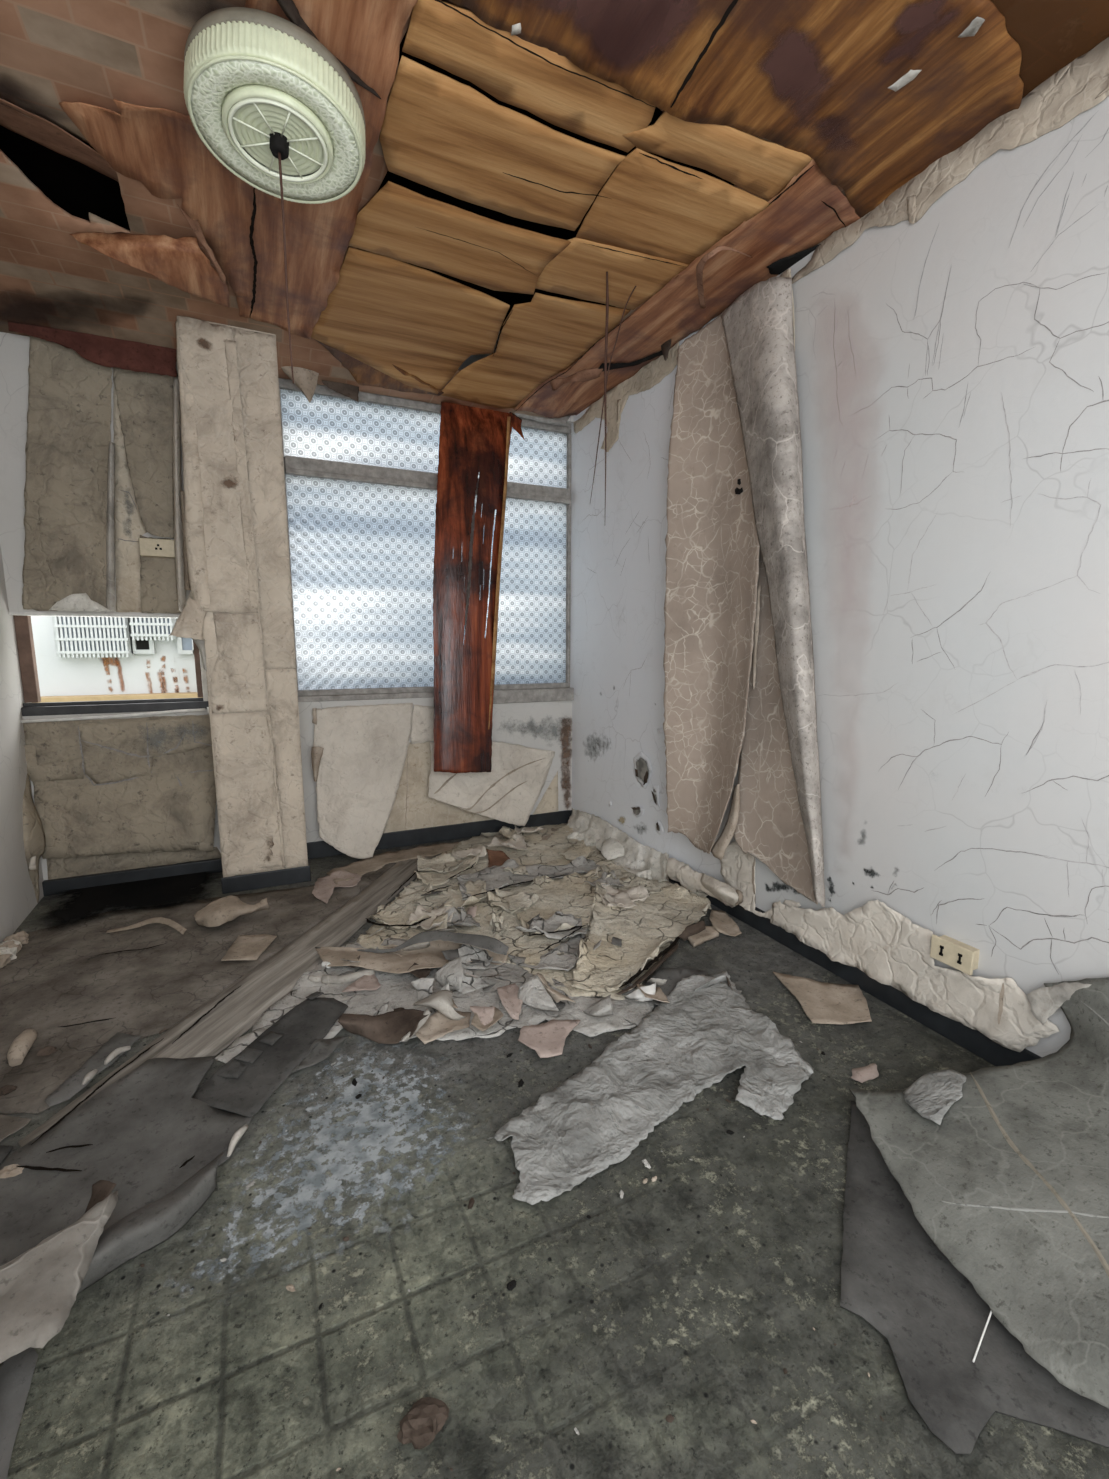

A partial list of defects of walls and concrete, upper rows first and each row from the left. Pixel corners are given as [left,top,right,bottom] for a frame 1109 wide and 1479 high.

leakage [512,0,700,70]
leakage [760,29,851,143]
leakage [882,0,958,64]
leakage [990,0,1109,99]
peeling [59,0,444,396]
crack [249,188,258,317]
crack [503,172,610,199]
peeling [449,0,1024,422]
crack [767,165,846,228]
crack [493,310,513,356]
crack [517,313,634,410]
crack [798,268,1109,974]